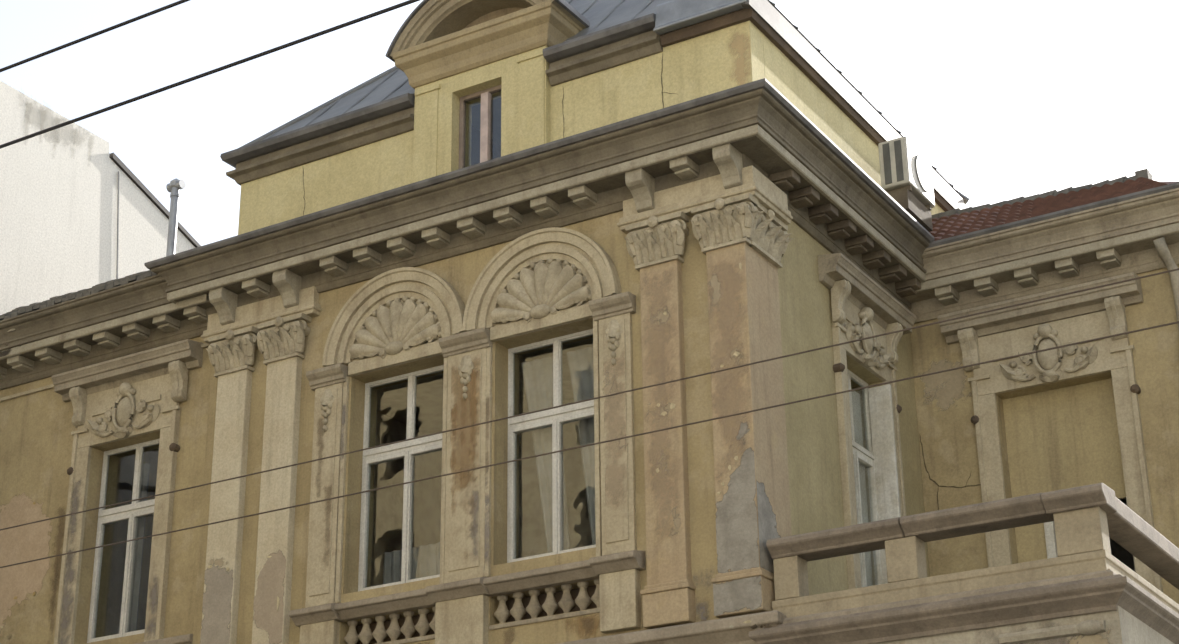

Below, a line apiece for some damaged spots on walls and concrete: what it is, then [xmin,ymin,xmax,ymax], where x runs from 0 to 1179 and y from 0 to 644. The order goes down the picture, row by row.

peeling [0,493,53,636]
damp [471,493,490,558]
peeling [713,422,780,629]
crack [919,433,981,510]